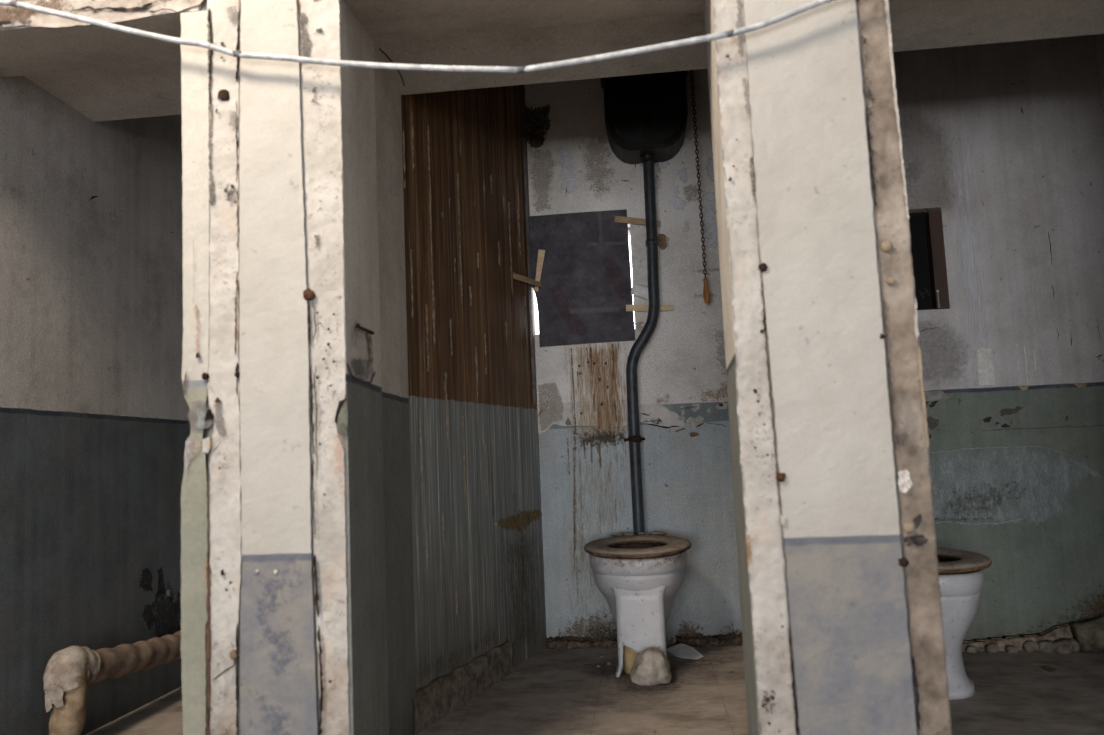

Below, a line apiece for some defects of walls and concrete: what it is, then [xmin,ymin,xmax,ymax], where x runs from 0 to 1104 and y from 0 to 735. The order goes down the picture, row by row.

flaking render [0,0,242,735]
crack [69,0,177,13]
flaking render [297,0,376,735]
spalling [525,105,551,149]
rust [567,343,621,503]
flaking render [537,0,797,735]
flaking render [857,0,952,735]
peeling [983,406,1104,431]